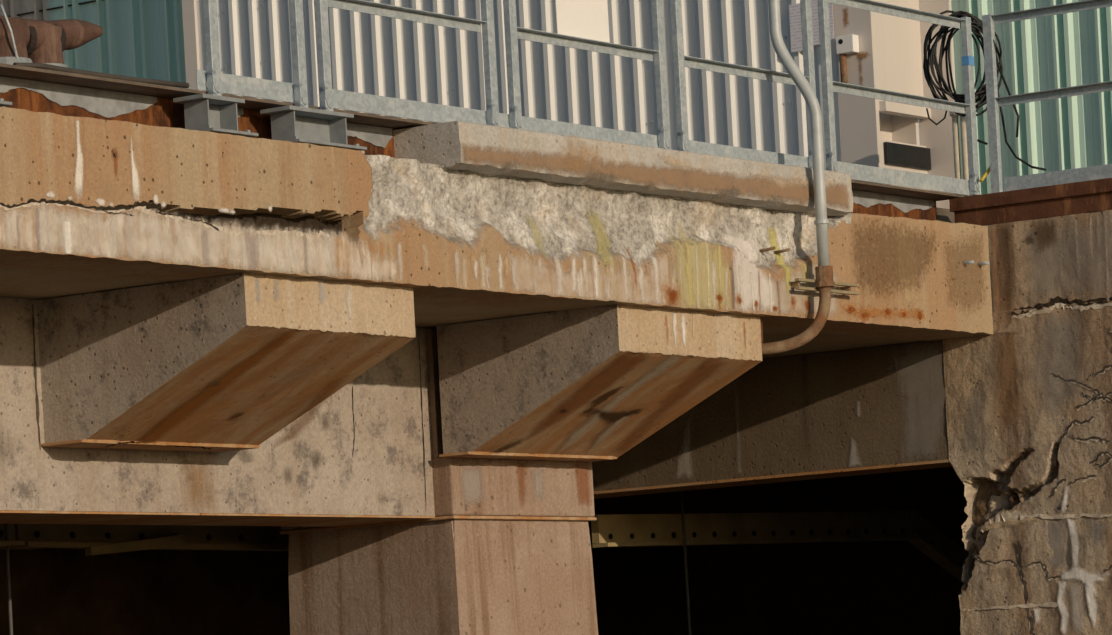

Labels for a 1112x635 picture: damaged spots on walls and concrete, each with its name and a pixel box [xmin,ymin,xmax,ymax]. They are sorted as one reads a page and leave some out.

leakage [75,120,83,194]
leakage [131,141,139,196]
crack [0,192,345,248]
leakage [0,205,401,316]
spalling [346,122,935,271]
corrosion [844,306,925,319]
crack [1011,296,1112,335]
crack [1050,365,1112,512]
crack [975,541,1063,635]
leakage [1048,487,1109,634]